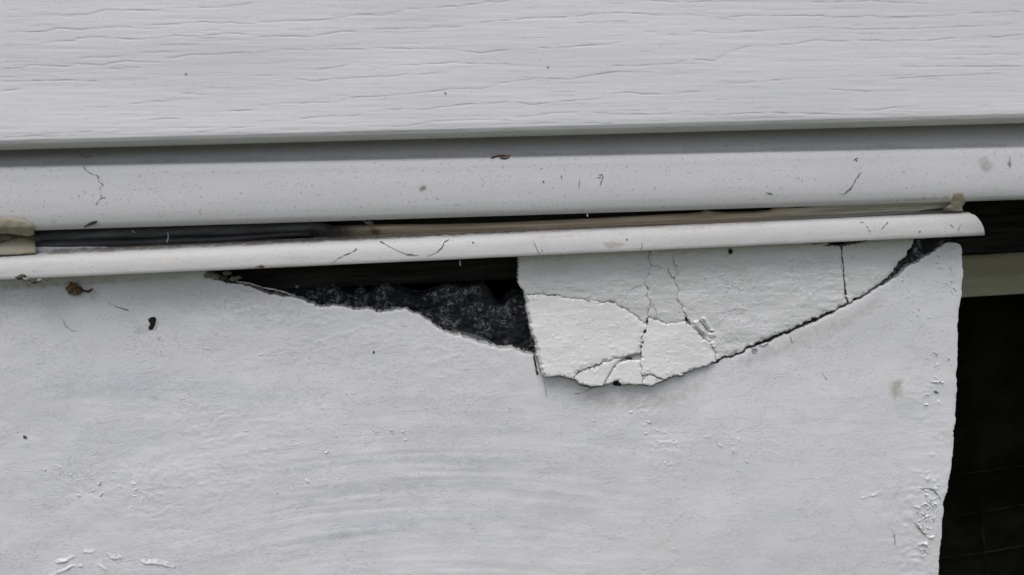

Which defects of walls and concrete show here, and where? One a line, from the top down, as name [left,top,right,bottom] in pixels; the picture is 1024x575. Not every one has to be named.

spalling [203,270,537,358]
crack [533,238,950,397]